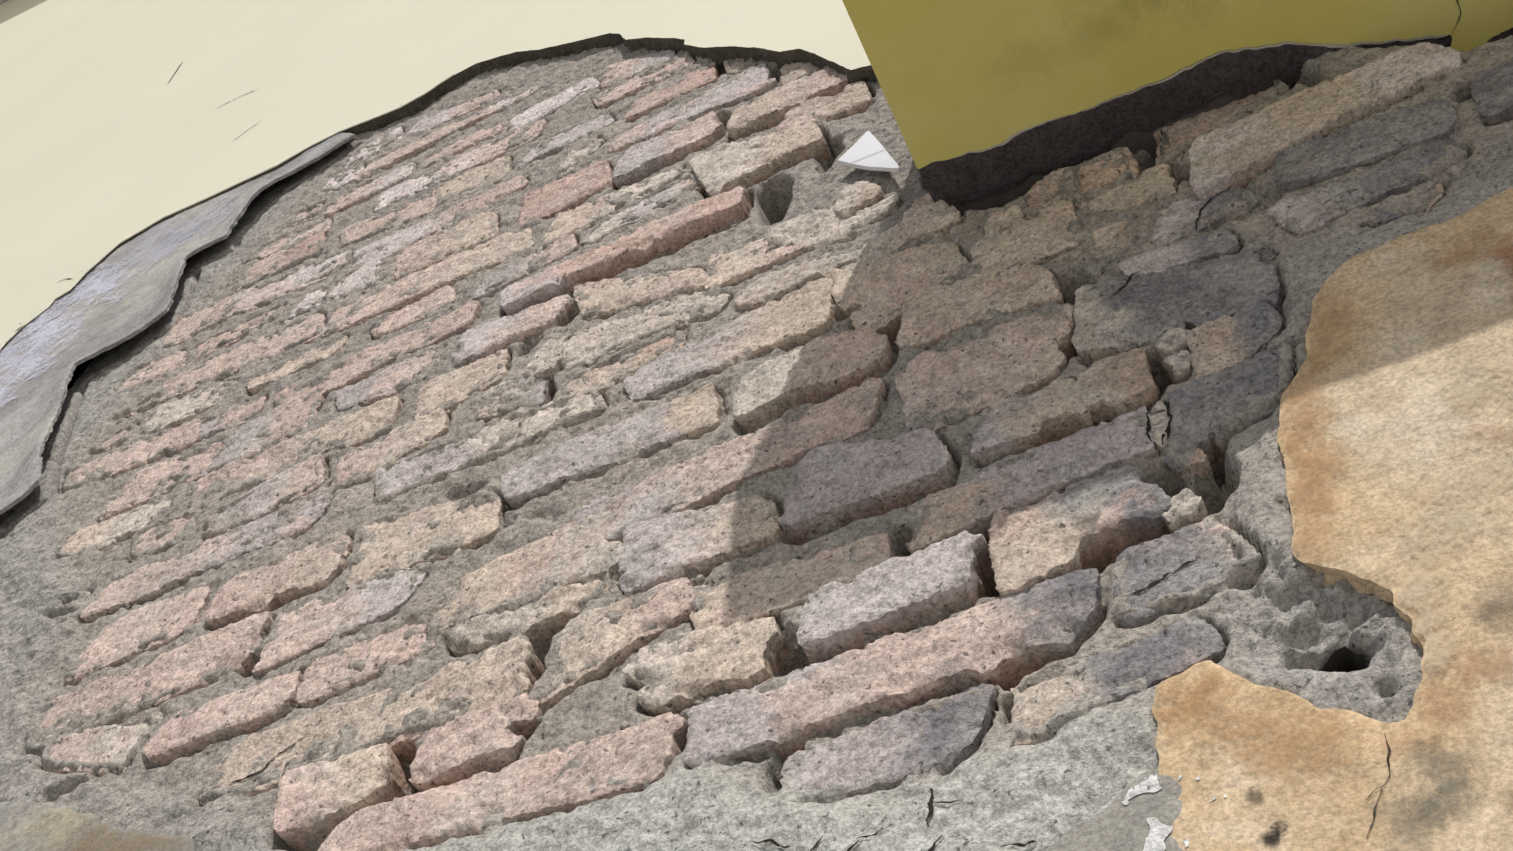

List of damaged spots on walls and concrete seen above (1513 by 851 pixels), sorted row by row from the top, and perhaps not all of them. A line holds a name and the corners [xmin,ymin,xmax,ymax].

peeling [0,73,455,350]
spalling [918,44,1343,206]
spalling [1355,35,1452,49]
spalling [1488,28,1513,42]
spalling [137,630,169,649]
spalling [281,495,1001,851]
damp [1396,458,1513,669]
spalling [401,676,1163,851]